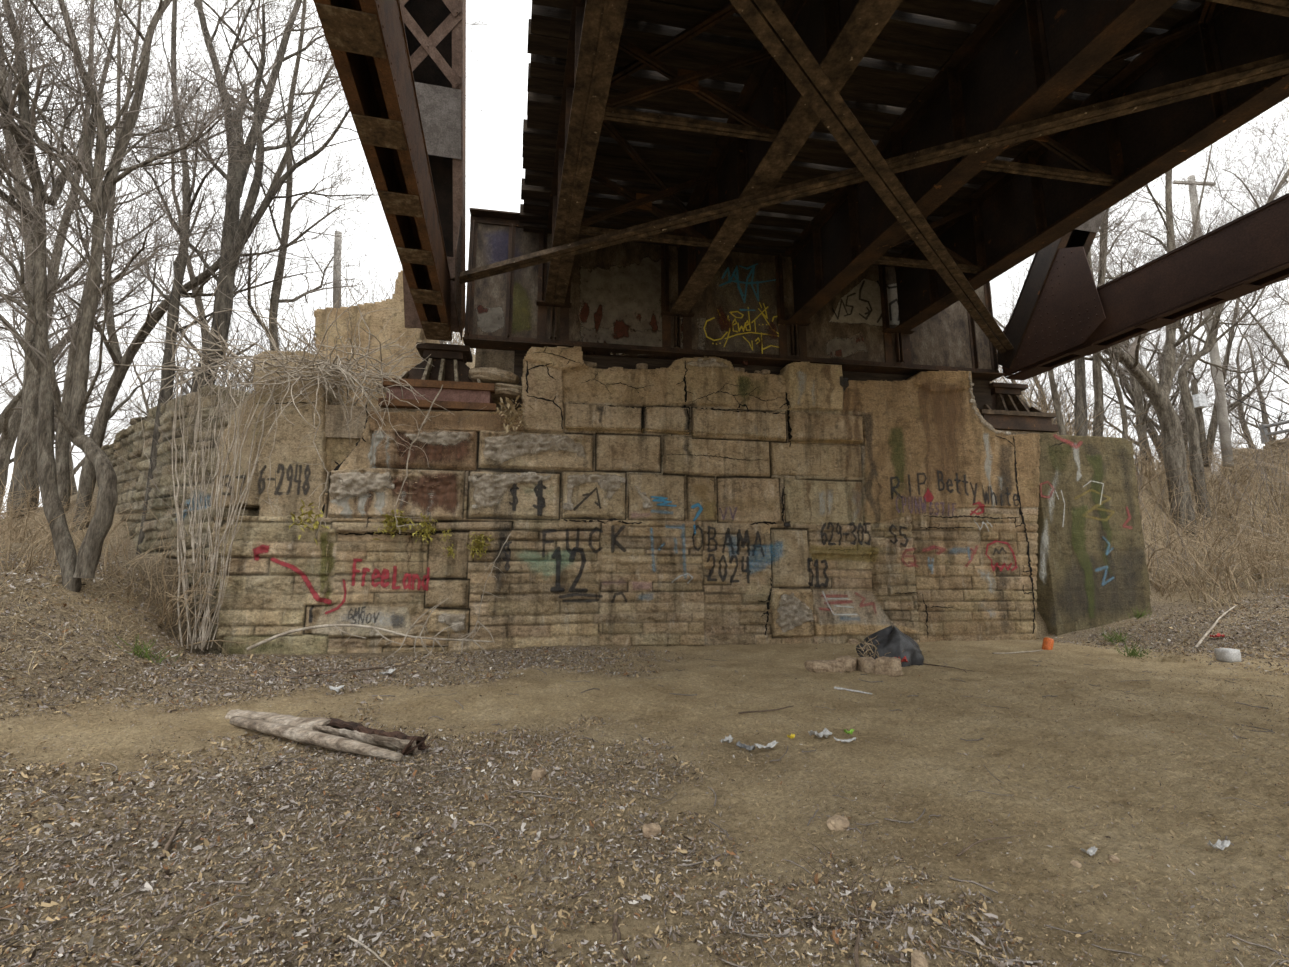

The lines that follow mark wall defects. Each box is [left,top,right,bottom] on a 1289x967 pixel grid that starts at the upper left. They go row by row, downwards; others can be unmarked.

crack [526,347,792,460]
spalling [969,373,1011,435]